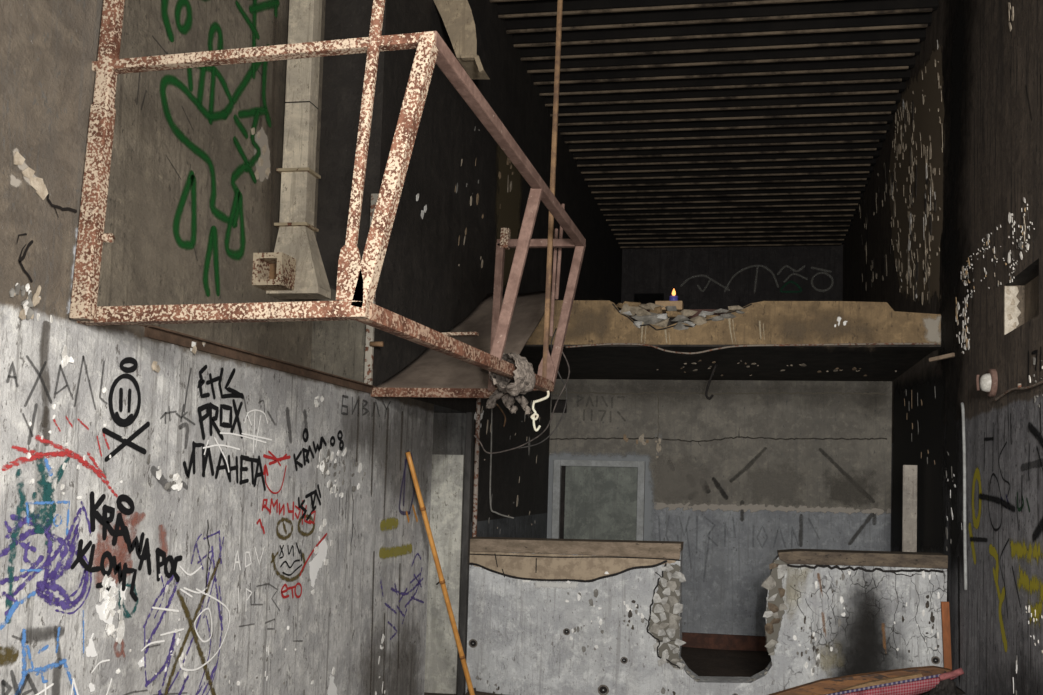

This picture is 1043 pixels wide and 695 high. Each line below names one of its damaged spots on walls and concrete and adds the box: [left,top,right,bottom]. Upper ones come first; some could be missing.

spalling [10,148,48,200]
spalling [955,197,1035,354]
spalling [612,301,752,331]
crack [549,428,887,446]
crack [787,564,944,654]
leakage [847,623,874,675]